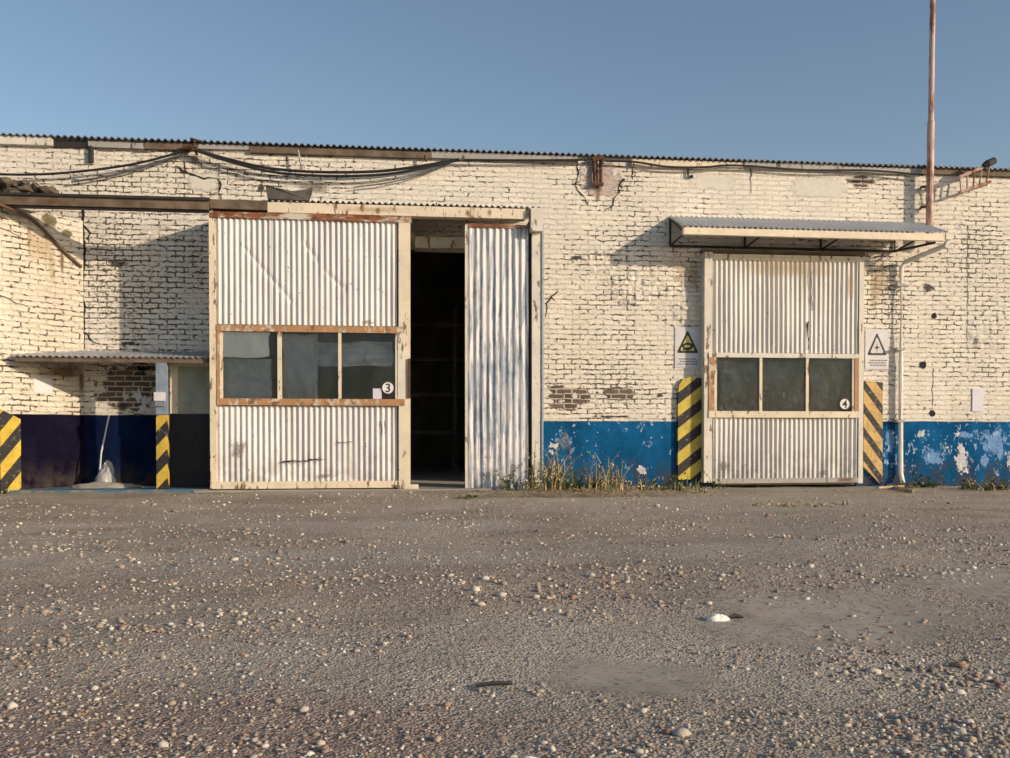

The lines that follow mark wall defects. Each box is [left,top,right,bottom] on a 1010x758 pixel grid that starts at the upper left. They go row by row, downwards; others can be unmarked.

spalling [95,363,156,417]
spalling [549,385,634,411]
peeling [921,427,1010,475]